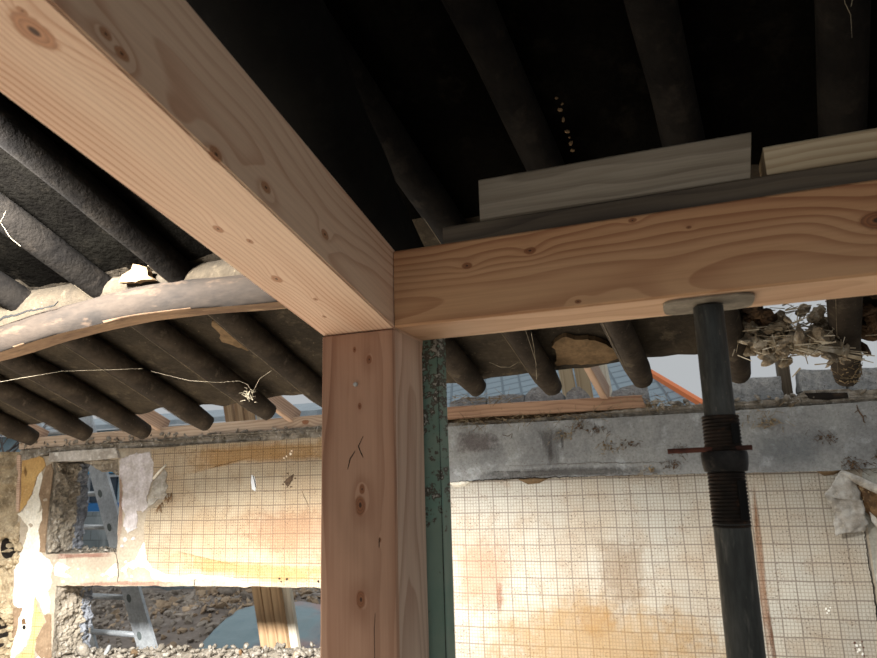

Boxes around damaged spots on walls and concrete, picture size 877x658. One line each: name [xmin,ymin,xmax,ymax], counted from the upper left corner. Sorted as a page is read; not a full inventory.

peeling [0,452,79,658]
peeling [119,452,172,547]